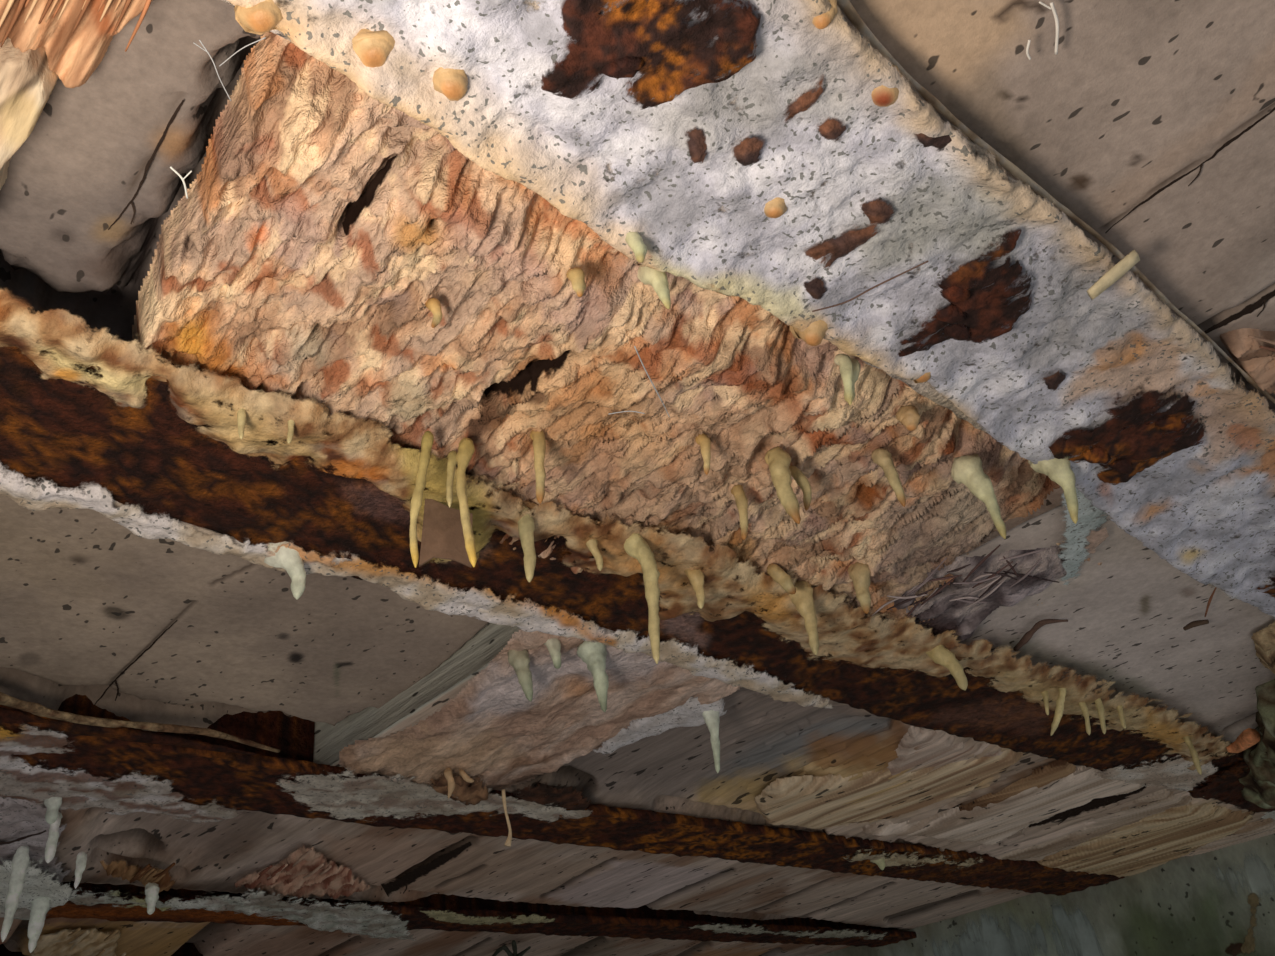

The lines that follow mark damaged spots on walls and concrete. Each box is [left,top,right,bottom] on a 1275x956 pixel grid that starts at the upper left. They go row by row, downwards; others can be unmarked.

spalling [0,0,153,190]
corrosion [541,0,761,110]
crack [1105,107,1275,233]
spalling [132,31,1067,642]
leakage [227,0,1275,619]
corrosion [898,229,1033,357]
crack [1204,290,1275,334]
corrosion [1049,386,1205,485]
leakage [0,289,1235,791]
leakage [0,724,416,953]
leakage [277,771,593,823]
spalling [755,726,1275,878]